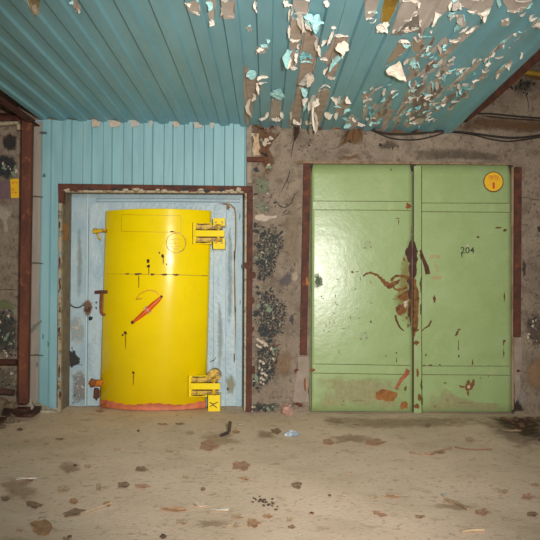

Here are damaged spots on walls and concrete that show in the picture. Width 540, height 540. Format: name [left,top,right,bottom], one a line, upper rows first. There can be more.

peeling [243,66,268,126]
spalling [252,133,271,156]
peeling [259,0,540,151]
corrosion [221,203,236,343]
corrosion [363,226,432,345]
corrosion [375,368,423,410]